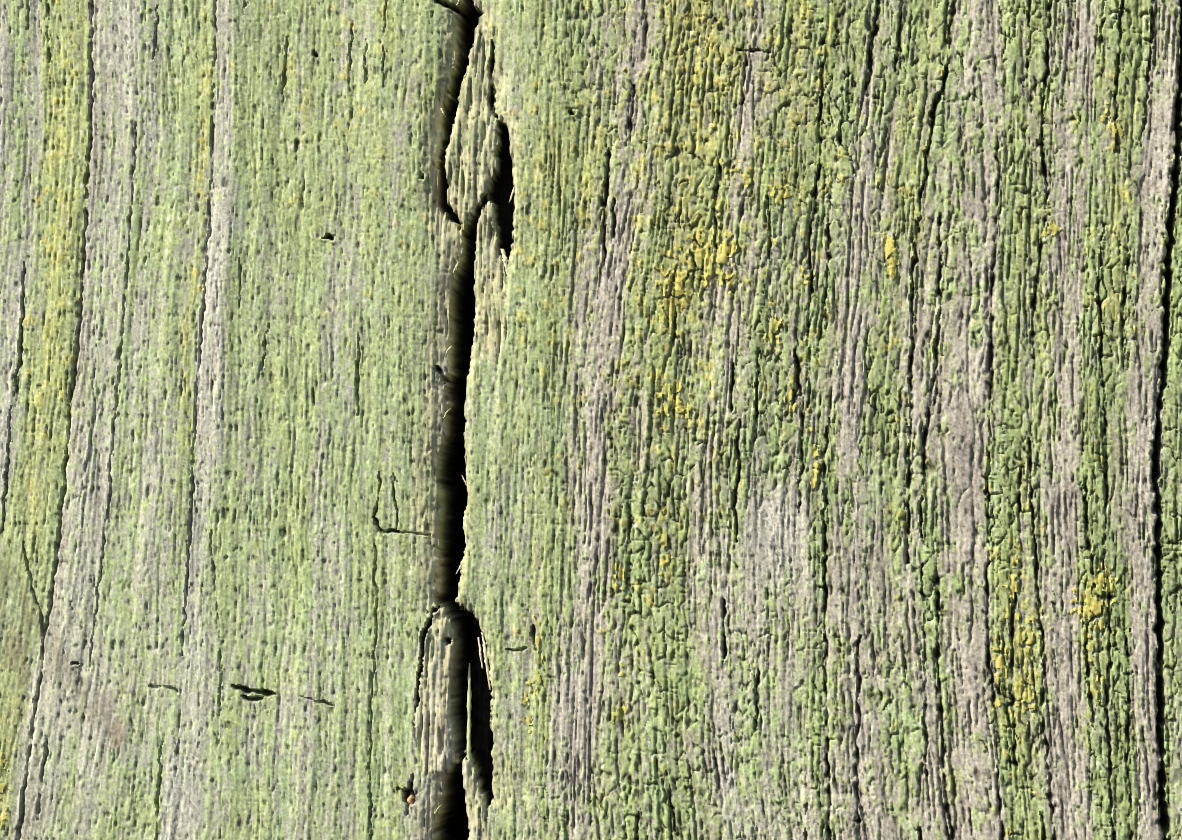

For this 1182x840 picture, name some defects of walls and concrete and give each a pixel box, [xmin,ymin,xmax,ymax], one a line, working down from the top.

crack [367,0,537,840]